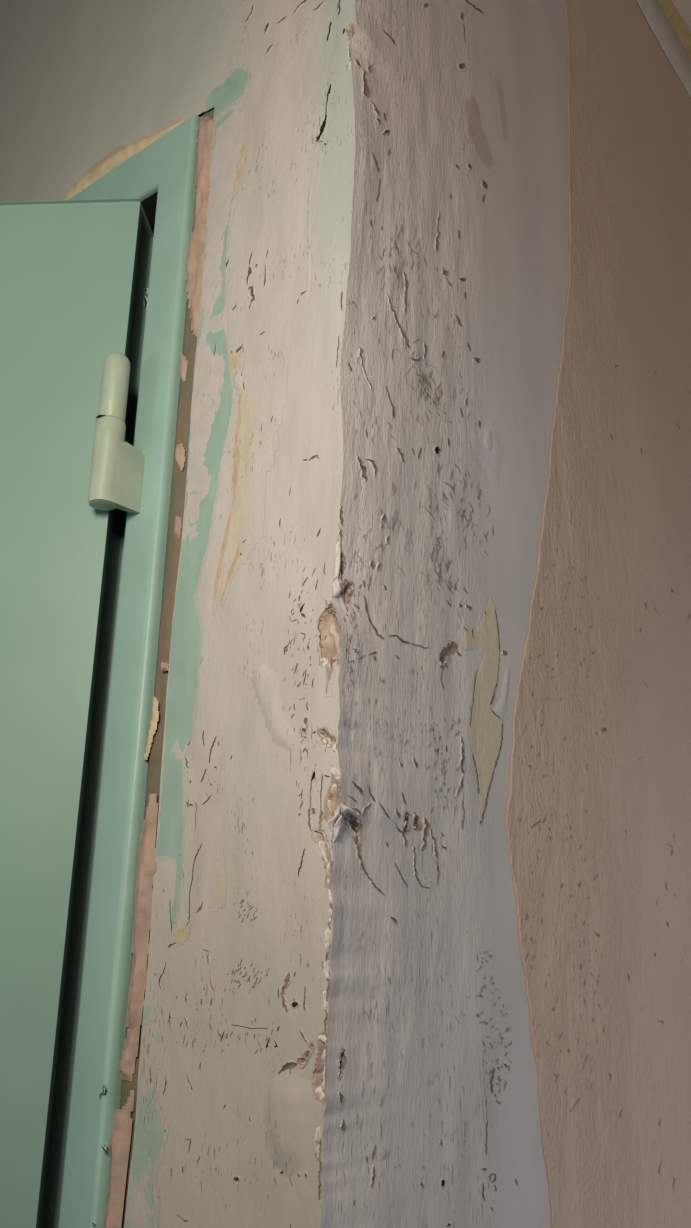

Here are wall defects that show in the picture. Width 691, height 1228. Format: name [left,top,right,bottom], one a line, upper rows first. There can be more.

crack [458,0,483,21]
peeling [64,117,190,200]
crack [315,84,332,148]
crack [349,58,488,444]
spalling [284,506,387,687]
peeling [461,595,510,825]
spalling [278,705,385,1104]
peeling [124,967,170,1228]
spalling [280,1127,322,1200]